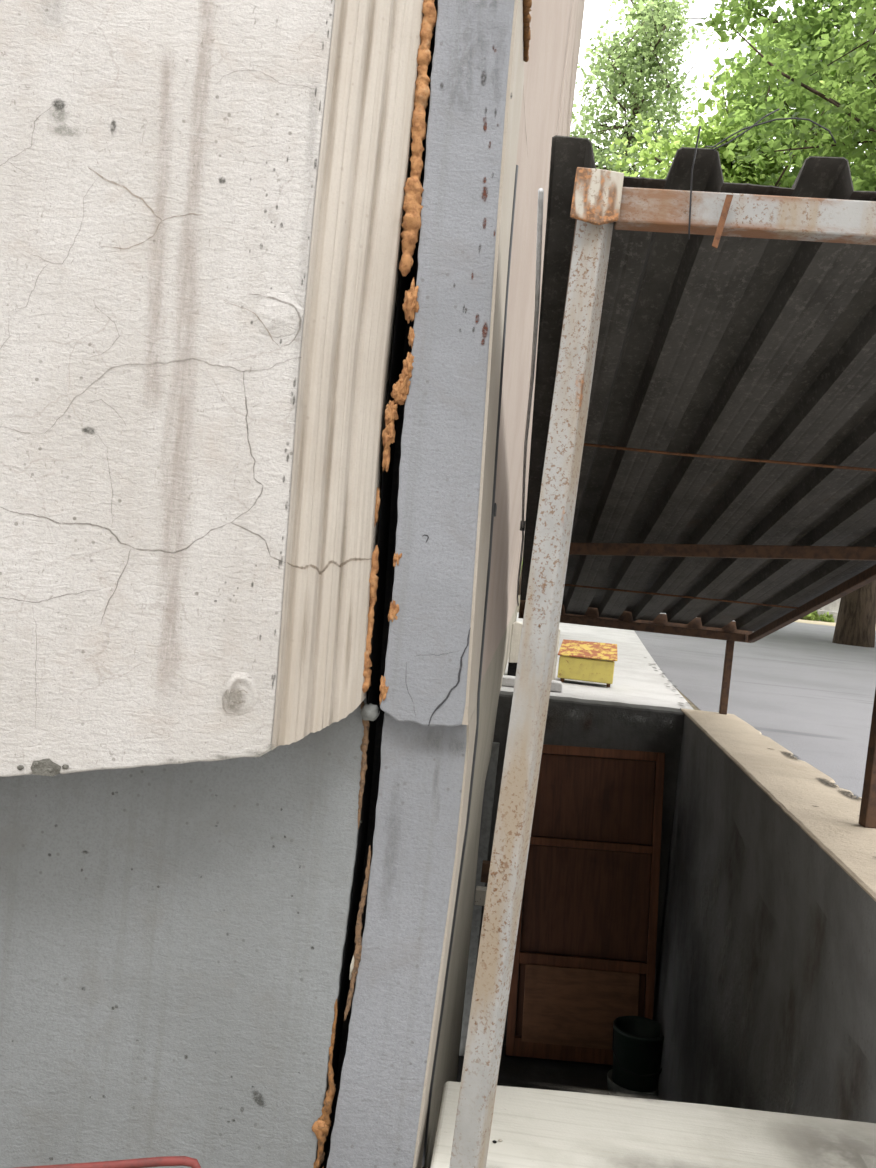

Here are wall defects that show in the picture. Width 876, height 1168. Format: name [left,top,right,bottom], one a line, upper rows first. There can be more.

crack [88,167,197,249]
crack [1,374,371,727]
crack [312,628,471,1168]